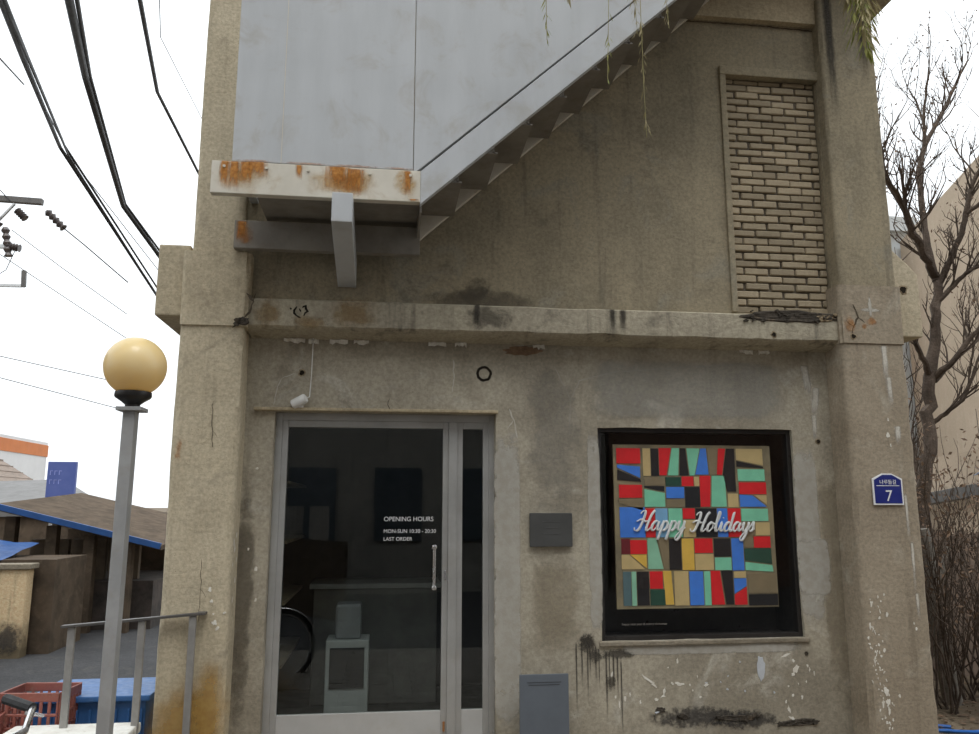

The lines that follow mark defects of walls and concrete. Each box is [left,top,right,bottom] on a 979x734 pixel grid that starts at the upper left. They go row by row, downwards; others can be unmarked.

corrosion [220,161,264,182]
corrosion [325,167,365,193]
corrosion [402,171,416,200]
leakage [443,292,526,321]
spalling [739,309,838,337]
peeling [867,594,901,730]
leakage [576,635,632,719]
peeling [642,675,729,714]
leakage [654,706,776,729]